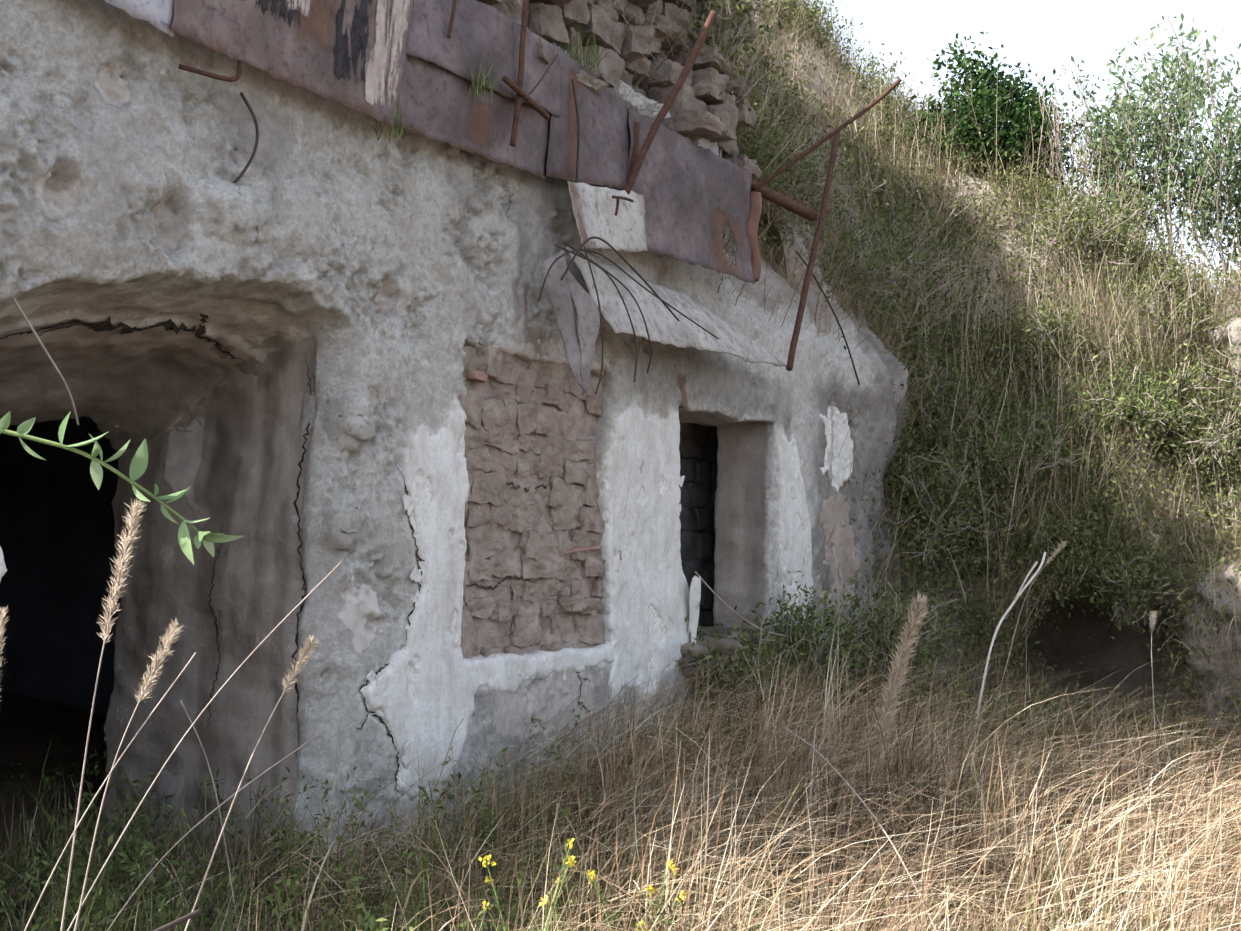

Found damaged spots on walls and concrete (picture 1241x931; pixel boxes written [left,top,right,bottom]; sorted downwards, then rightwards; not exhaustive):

crack [0,314,246,362]
spalling [492,333,613,384]
crack [291,354,313,771]
peeling [358,402,701,803]